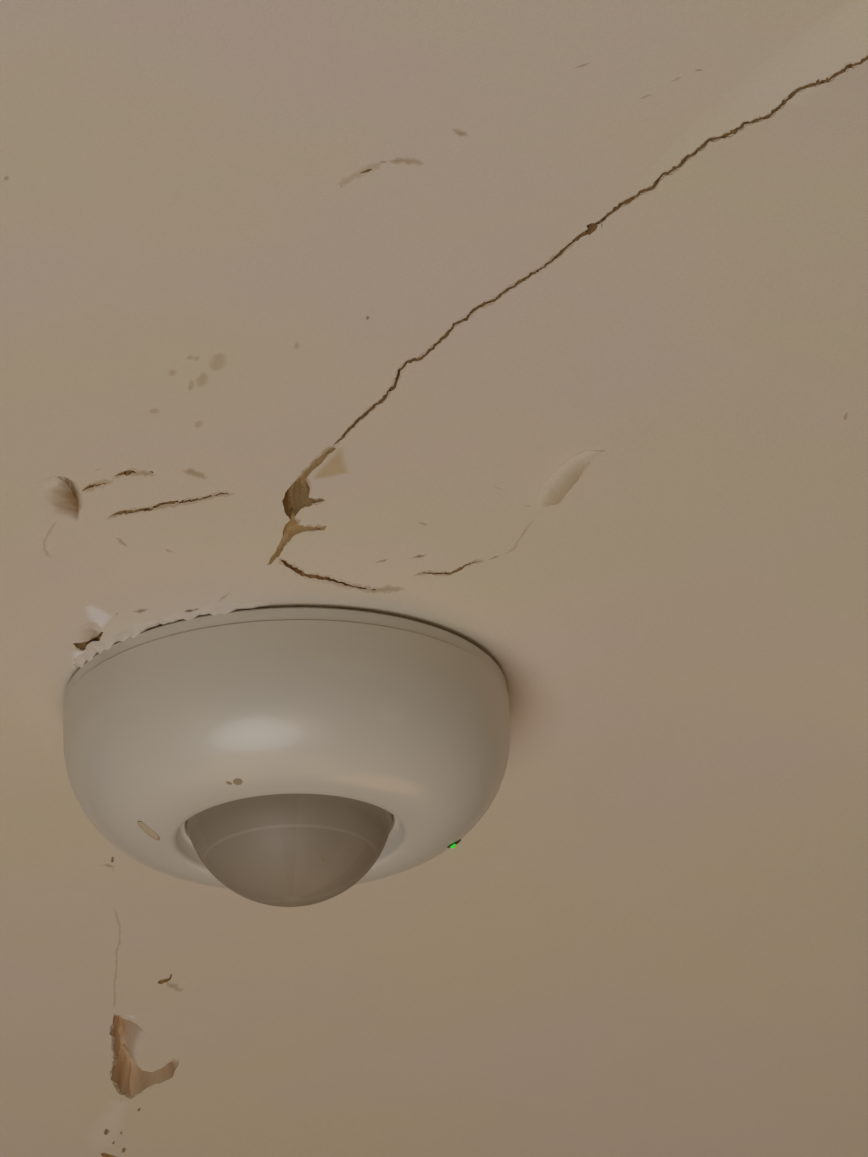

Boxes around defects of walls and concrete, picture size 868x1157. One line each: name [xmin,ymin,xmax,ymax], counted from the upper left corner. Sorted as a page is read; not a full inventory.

crack [334,50,868,446]
flaking render [30,476,79,560]
crack [79,467,235,548]
flaking render [267,444,352,565]
crack [276,517,535,595]
flaking render [523,450,605,508]
flaking render [71,591,270,672]
flaking render [80,1013,179,1157]